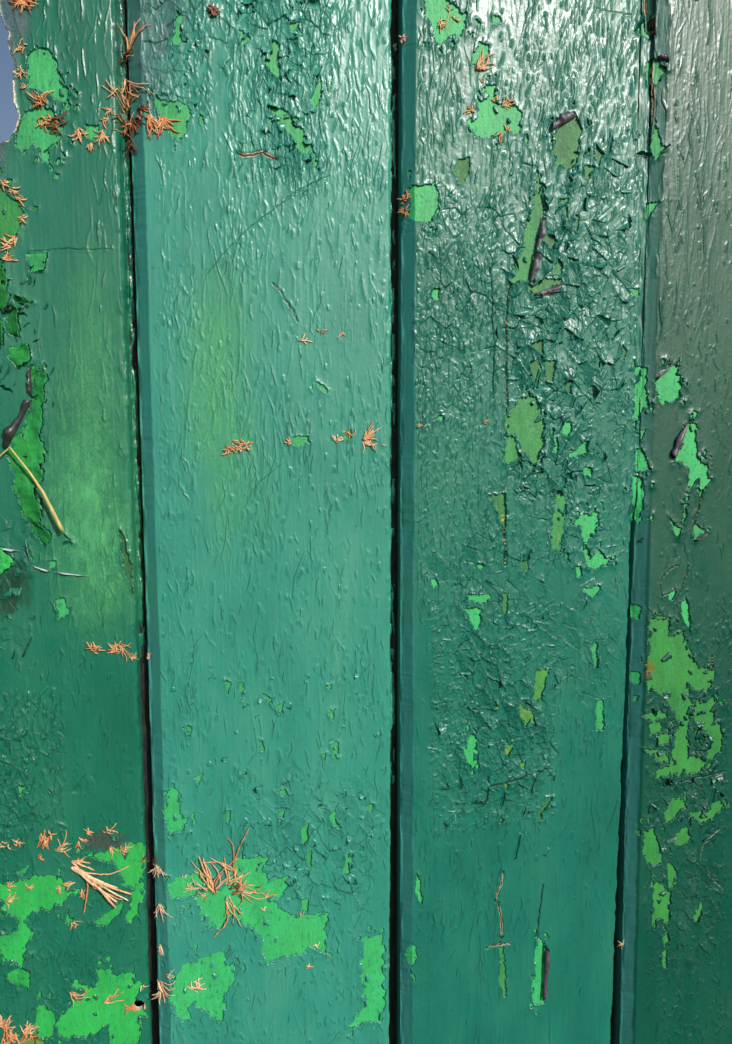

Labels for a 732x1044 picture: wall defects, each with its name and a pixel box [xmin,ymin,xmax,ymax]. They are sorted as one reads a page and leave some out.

peeling [420,0,501,65]
crack [237,150,277,160]
peeling [467,75,528,149]
peeling [0,169,90,598]
crack [489,267,512,425]
crack [485,771,540,802]
peeling [630,591,730,968]
peeling [76,836,147,926]
peeling [162,789,381,964]
peeling [0,864,148,1044]
peeling [162,944,245,1029]
peeling [529,930,550,1013]